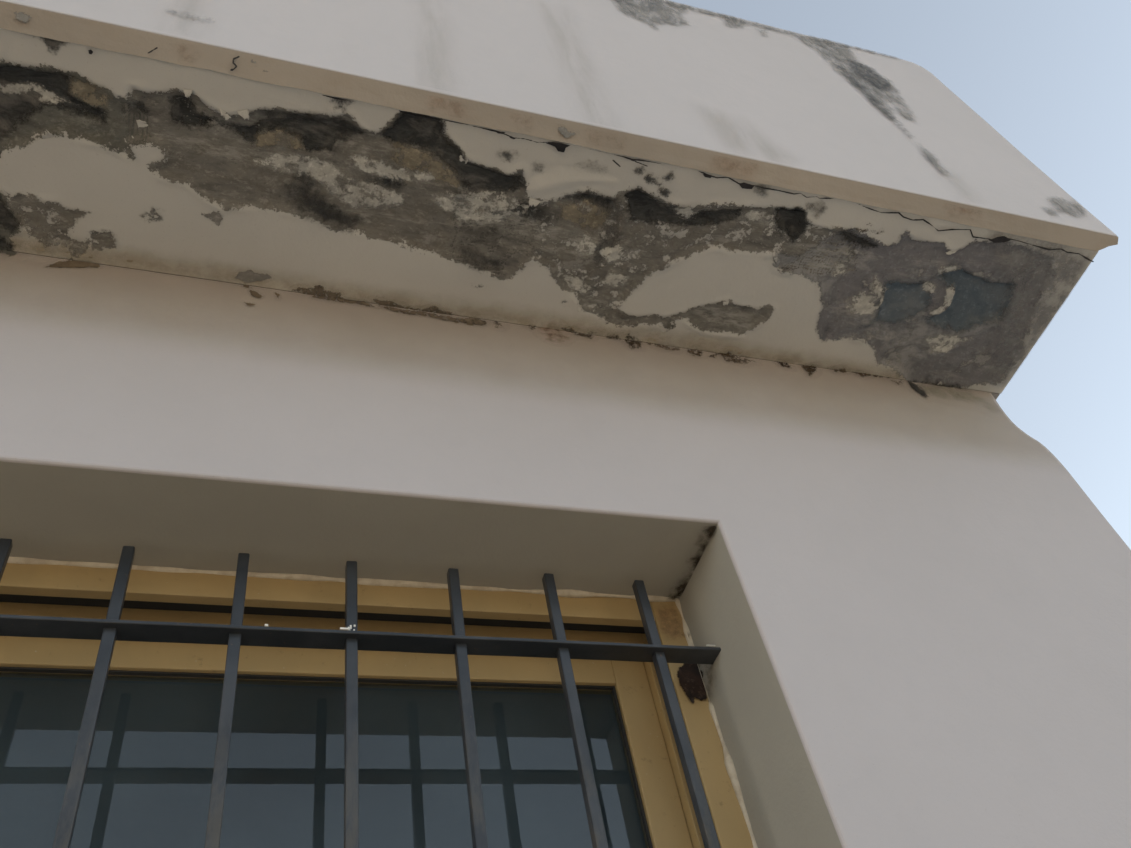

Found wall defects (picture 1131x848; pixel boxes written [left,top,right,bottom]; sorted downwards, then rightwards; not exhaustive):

spalling [40,37,66,51]
leakage [616,0,913,120]
crack [399,110,661,167]
spalling [0,59,1082,397]
crack [699,171,1094,262]